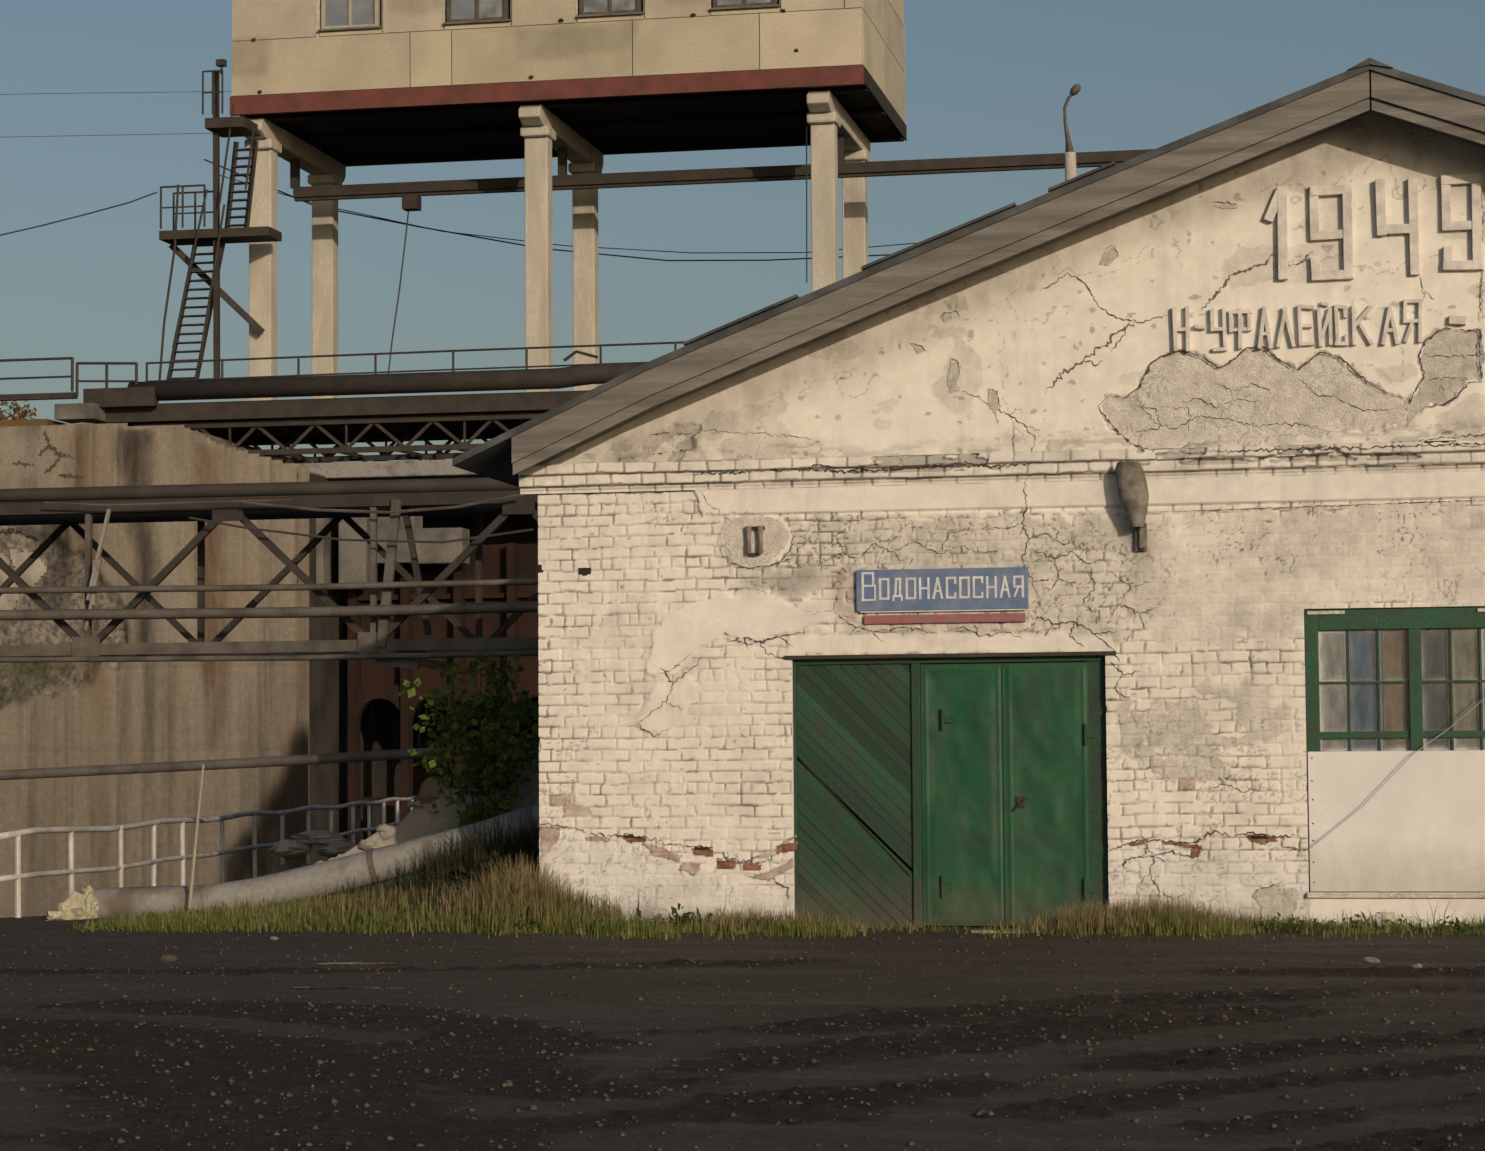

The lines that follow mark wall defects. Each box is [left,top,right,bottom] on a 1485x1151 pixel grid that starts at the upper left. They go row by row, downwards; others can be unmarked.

crack [1202,251,1313,309]
peeling [1098,270,1484,449]
crack [12,430,84,478]
crack [638,273,1163,737]
spalling [0,549,47,610]
peeling [646,594,857,676]
spalling [539,823,798,899]
spalling [1108,830,1299,869]